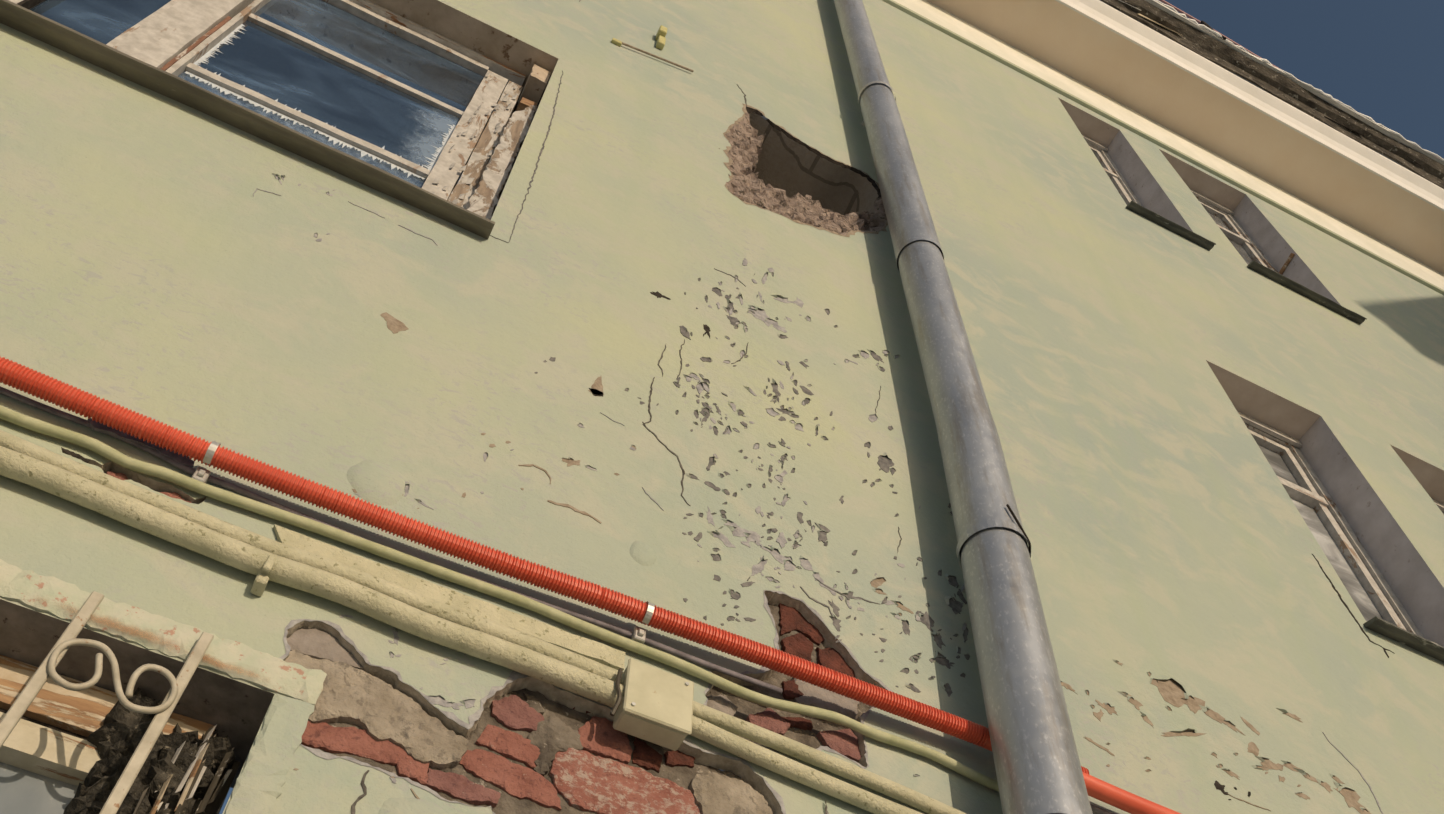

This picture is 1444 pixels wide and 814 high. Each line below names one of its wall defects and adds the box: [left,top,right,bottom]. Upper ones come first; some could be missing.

spalling [719,103,888,237]
flaking render [381,312,408,334]
peeling [402,481,434,510]
peeling [547,500,602,524]
peeling [562,457,597,471]
flaking render [588,376,604,397]
crack [600,339,691,511]
flaking render [650,258,971,697]
crack [1312,554,1395,658]
flaking render [280,615,786,814]
flaking render [704,667,875,769]
peeling [1061,672,1371,814]